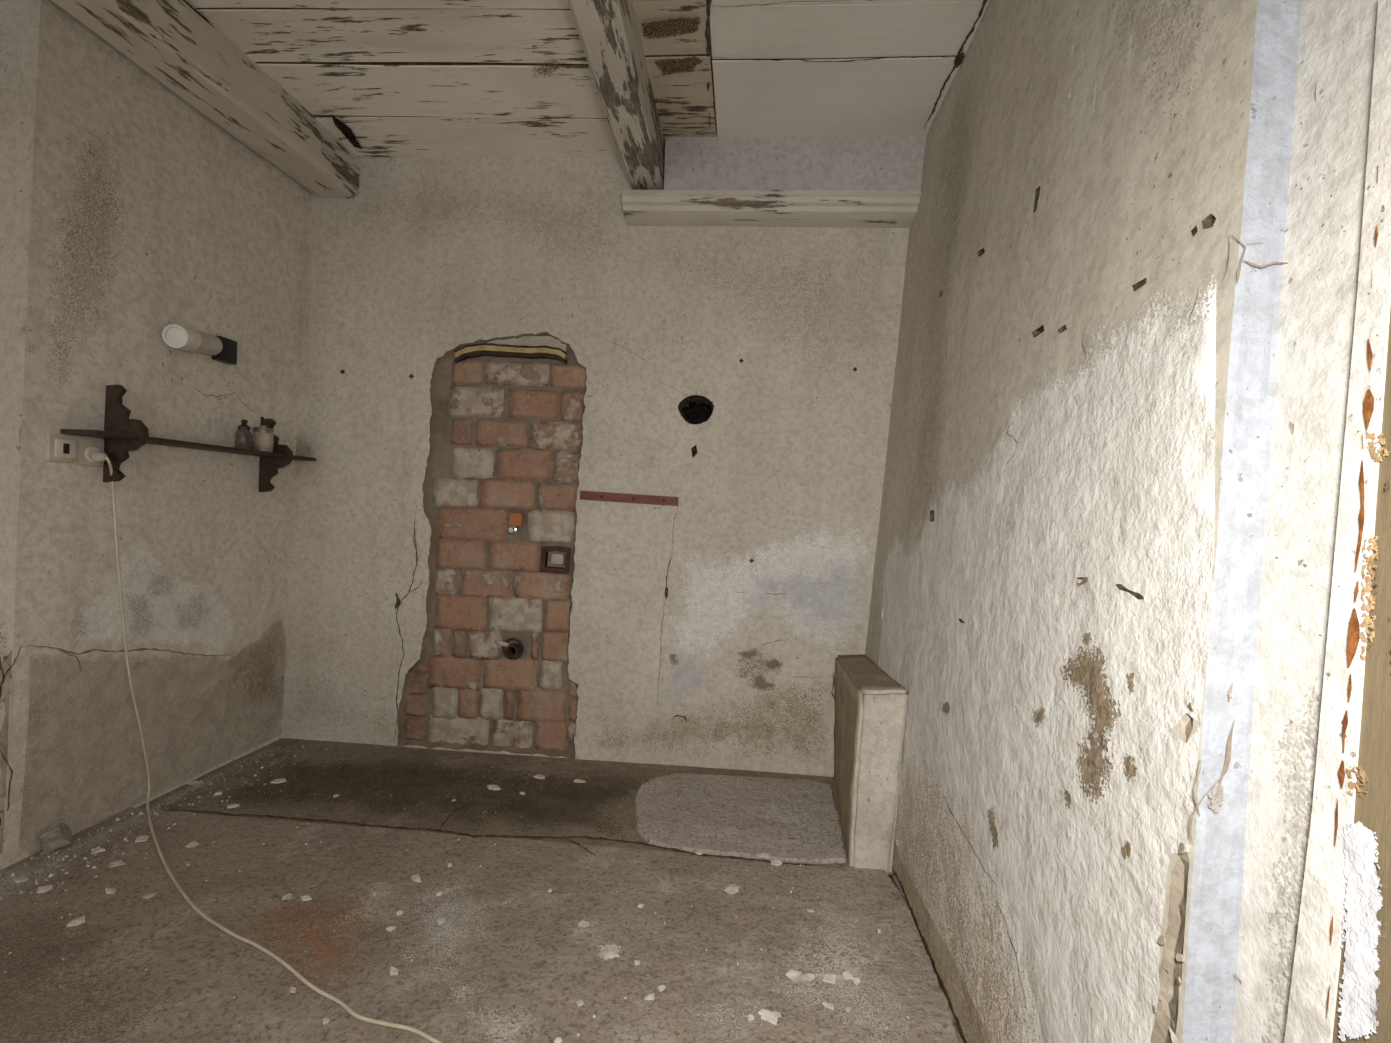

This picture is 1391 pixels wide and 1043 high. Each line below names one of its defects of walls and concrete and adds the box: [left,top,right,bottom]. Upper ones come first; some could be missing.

crack [705,0,988,128]
flaking render [0,651,12,854]
crack [0,749,13,826]
crack [0,646,230,696]
damp [0,618,645,1043]
damp [589,63,1217,1043]
corrosion [1334,389,1389,846]